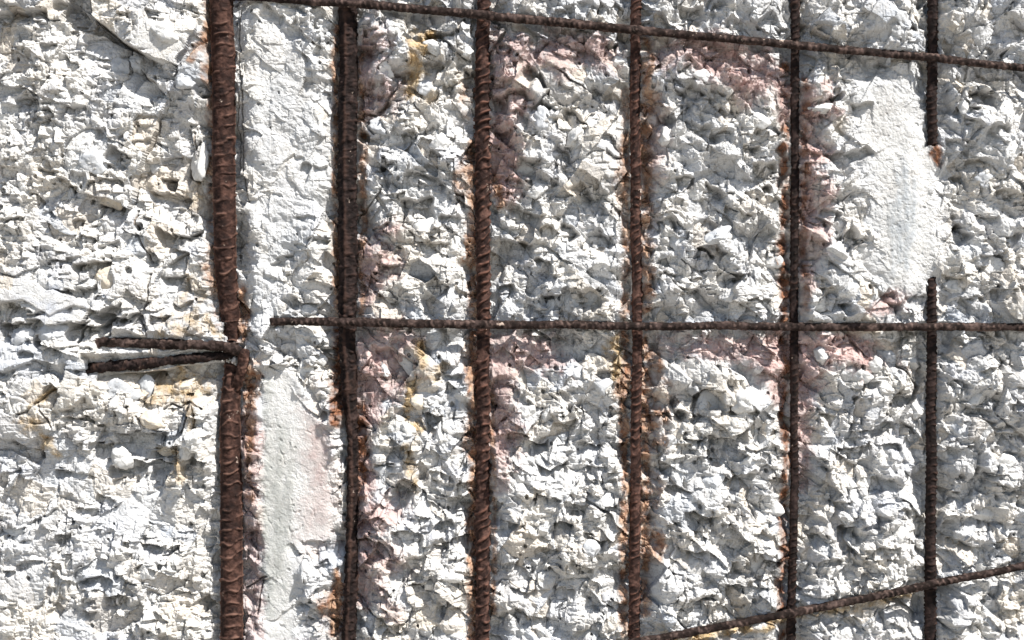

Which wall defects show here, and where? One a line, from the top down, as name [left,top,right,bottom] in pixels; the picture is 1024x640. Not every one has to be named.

spalling [0,261,135,369]
spalling [81,8,172,103]
spalling [90,359,244,640]
spalling [209,0,241,345]
corrosion [241,365,262,539]
corrosion [317,568,344,636]
corrosion [330,25,340,312]
corrosion [406,31,437,95]
corrosion [454,140,477,640]
corrosion [603,294,669,637]
spalling [336,0,1024,640]
corrosion [621,37,874,640]